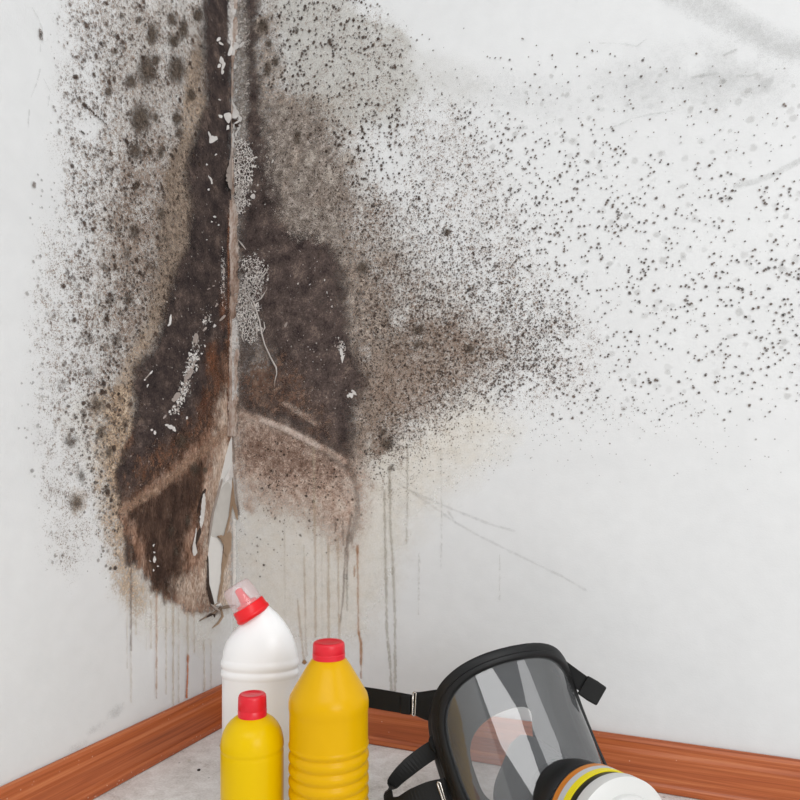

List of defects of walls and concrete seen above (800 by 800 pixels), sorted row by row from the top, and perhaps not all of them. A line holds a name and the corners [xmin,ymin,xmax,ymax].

peeling [163,0,245,605]
water stain [26,0,800,632]